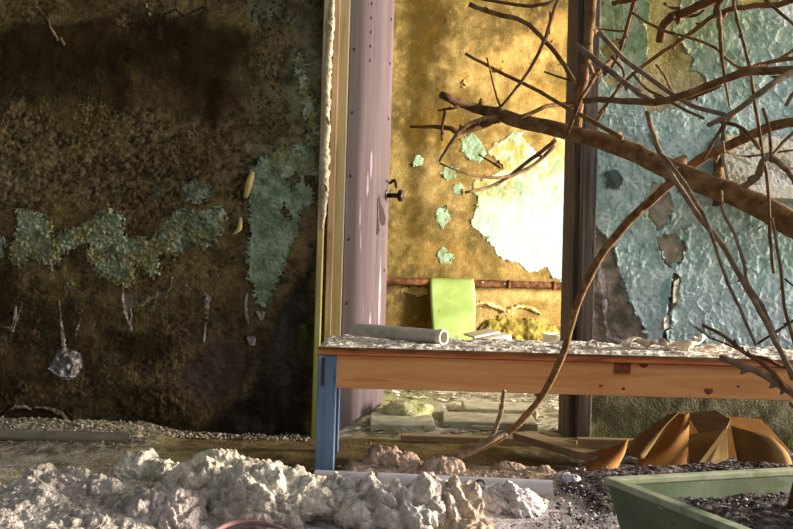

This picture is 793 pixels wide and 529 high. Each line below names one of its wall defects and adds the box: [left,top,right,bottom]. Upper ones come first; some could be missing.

crack [163,0,209,17]
damp [0,17,249,84]
peeling [598,0,793,175]
peeling [0,129,228,288]
peeling [435,205,451,229]
peeling [436,246,454,265]
peeling [439,131,565,282]
peeling [581,149,793,351]
damp [0,303,22,332]
damp [107,277,173,360]
damp [202,294,211,343]
damp [207,271,309,436]